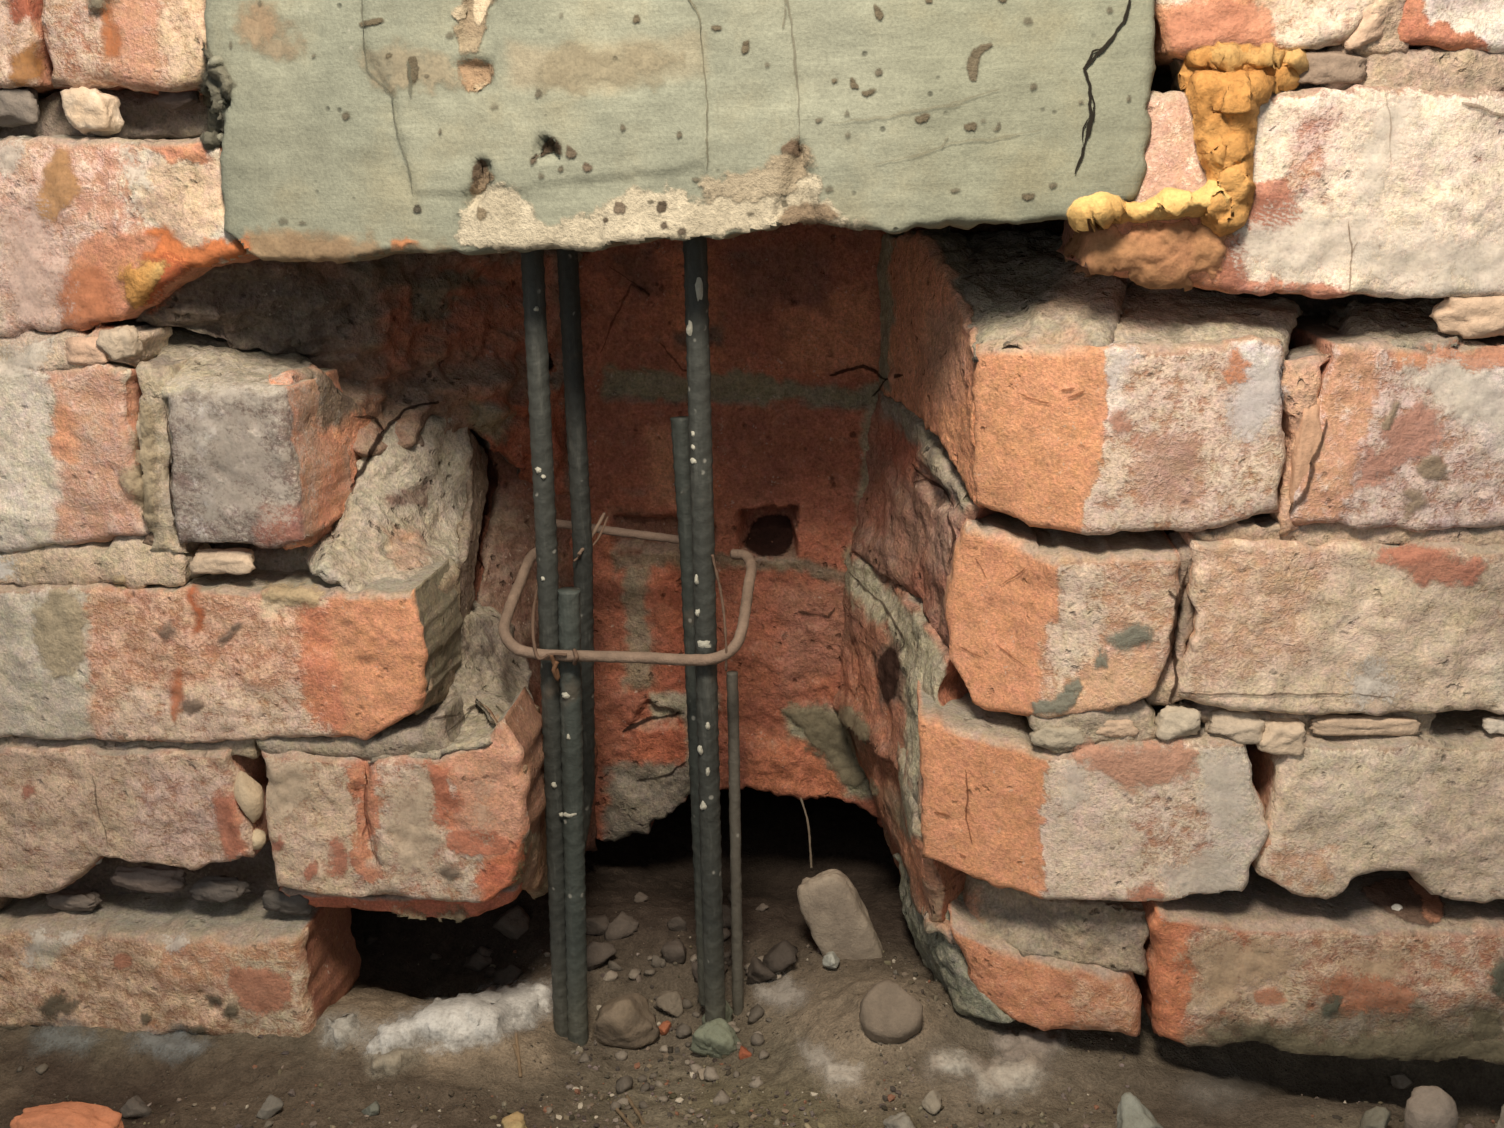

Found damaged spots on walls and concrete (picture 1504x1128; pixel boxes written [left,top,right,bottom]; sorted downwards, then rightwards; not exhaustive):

spalling [832,68,883,96]
spalling [967,43,993,81]
crack [1075,0,1131,174]
spalling [454,137,870,253]
crack [350,401,439,488]
spalling [743,514,793,557]
spalling [877,647,900,701]
spalling [425,760,509,856]
spalling [304,837,350,881]
spalling [228,966,291,1016]
damp [324,1013,363,1047]